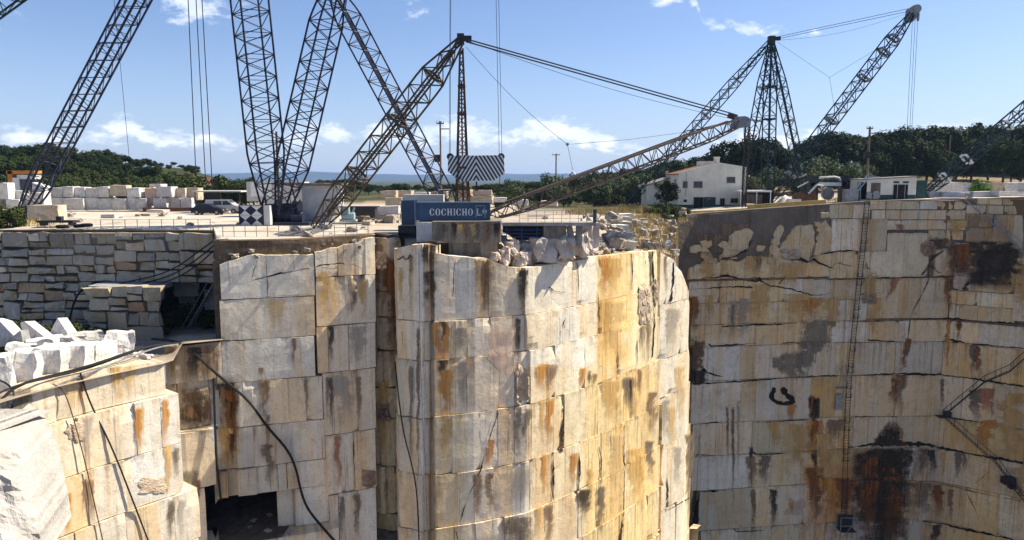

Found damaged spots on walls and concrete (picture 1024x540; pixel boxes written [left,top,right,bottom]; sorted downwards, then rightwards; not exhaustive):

damp [949,241,1021,285]
spalling [638,278,658,325]
crack [699,240,1024,349]
corrosion [433,321,453,449]
corrosion [536,364,558,383]
damp [773,320,831,377]
corrosion [136,407,145,442]
corrosion [162,399,172,478]
spalling [138,476,169,494]
crack [456,413,499,539]
damp [578,486,606,520]
damp [854,422,967,540]